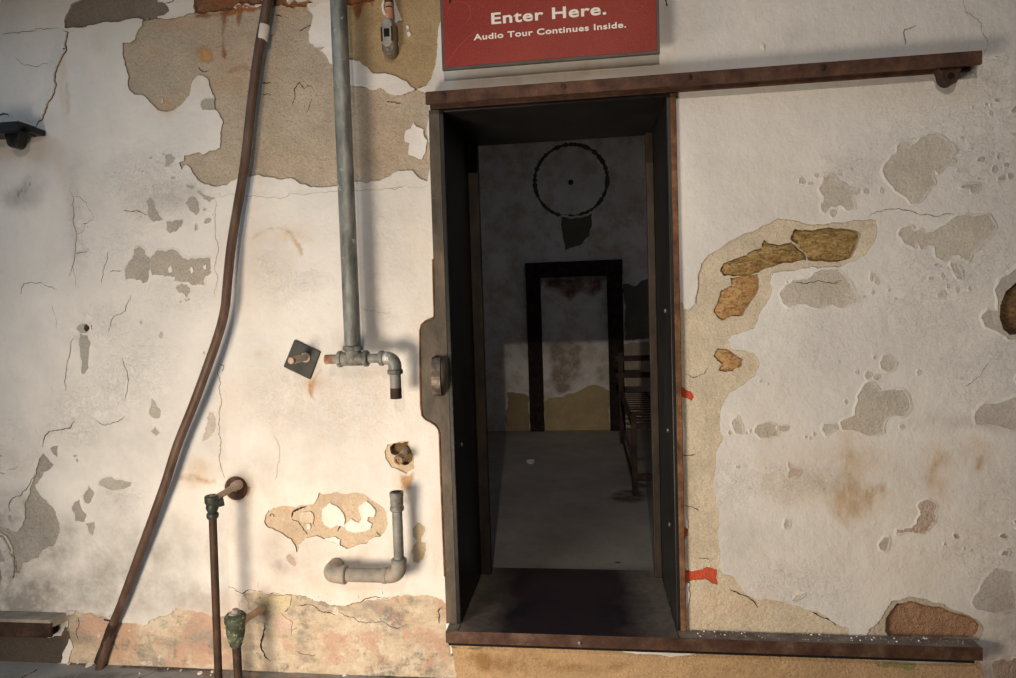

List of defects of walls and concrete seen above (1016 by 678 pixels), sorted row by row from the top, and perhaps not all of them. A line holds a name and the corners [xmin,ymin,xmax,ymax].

crack [0,27,69,127]
peeling [60,0,338,235]
peeling [347,0,442,186]
peeling [123,245,213,304]
peeling [544,382,610,430]
peeling [622,276,651,430]
peeling [680,132,1016,646]
peeling [381,436,419,477]
peeling [0,443,134,577]
peeling [260,488,392,571]
peeling [410,521,429,565]
peeling [0,590,1016,678]